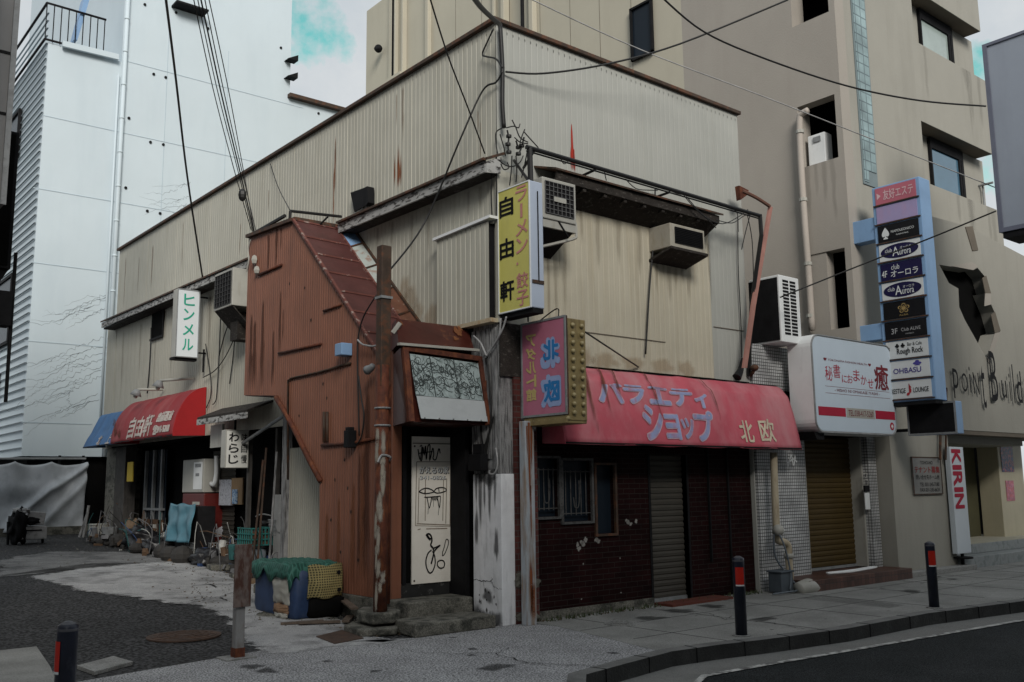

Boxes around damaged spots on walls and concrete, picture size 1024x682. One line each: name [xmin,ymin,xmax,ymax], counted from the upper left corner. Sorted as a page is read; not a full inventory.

crack [2,295,106,429]
corrosion [250,294,284,374]
water stain [475,470,496,540]
water stain [476,590,500,625]